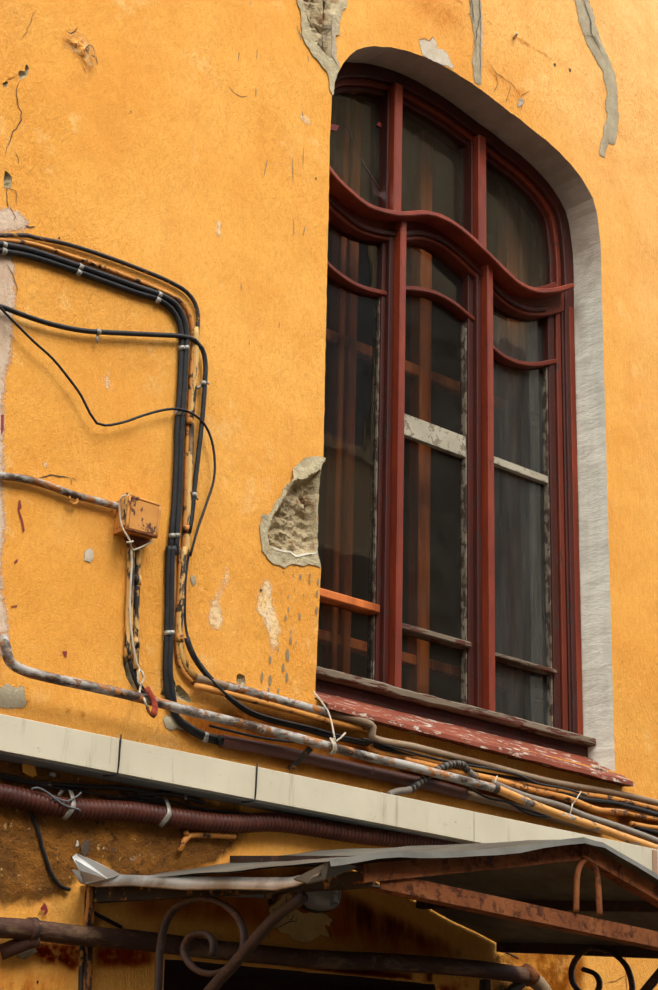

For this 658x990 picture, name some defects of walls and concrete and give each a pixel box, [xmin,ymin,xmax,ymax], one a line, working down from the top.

spalling [297,0,347,95]
peeling [418,37,454,69]
peeling [0,254,18,637]
spalling [260,456,326,569]
peeling [208,571,229,630]
peeling [257,581,281,647]
peeling [0,683,26,708]
peeling [268,909,333,943]
corrosion [35,943,79,969]
corrosion [98,948,151,966]